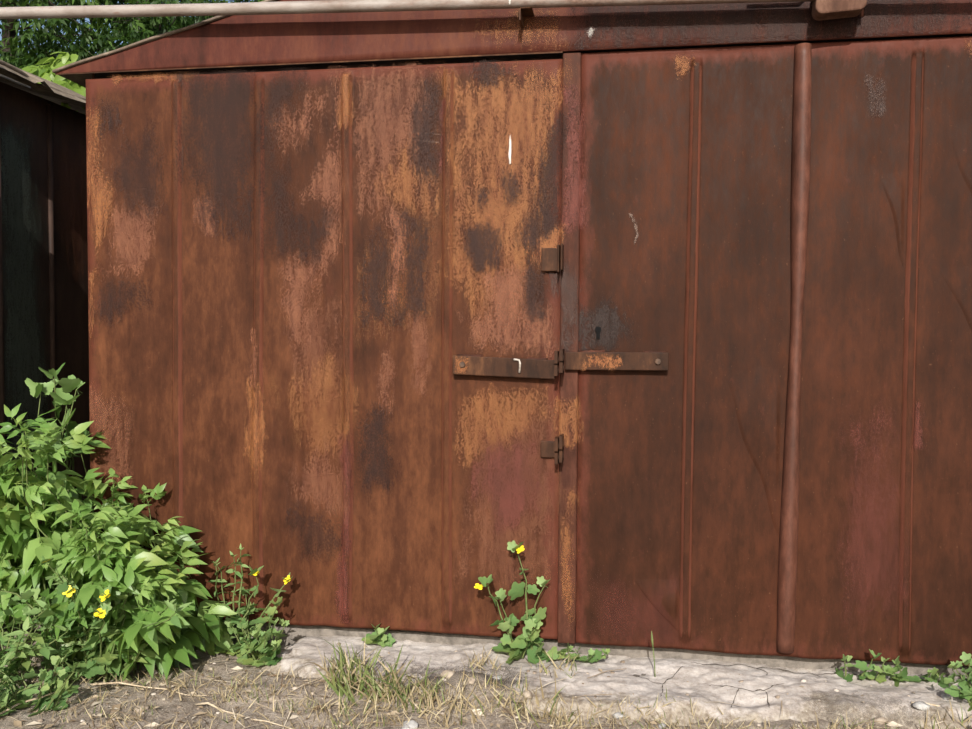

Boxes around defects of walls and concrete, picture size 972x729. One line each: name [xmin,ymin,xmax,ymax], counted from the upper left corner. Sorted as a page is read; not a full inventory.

rust [111,71,196,84]
rust [675,56,694,78]
rust [87,108,159,277]
rust [265,61,587,358]
rust [582,354,622,370]
rust [244,329,268,479]
rust [455,384,583,467]
rust [562,488,578,619]
crack [626,662,890,707]